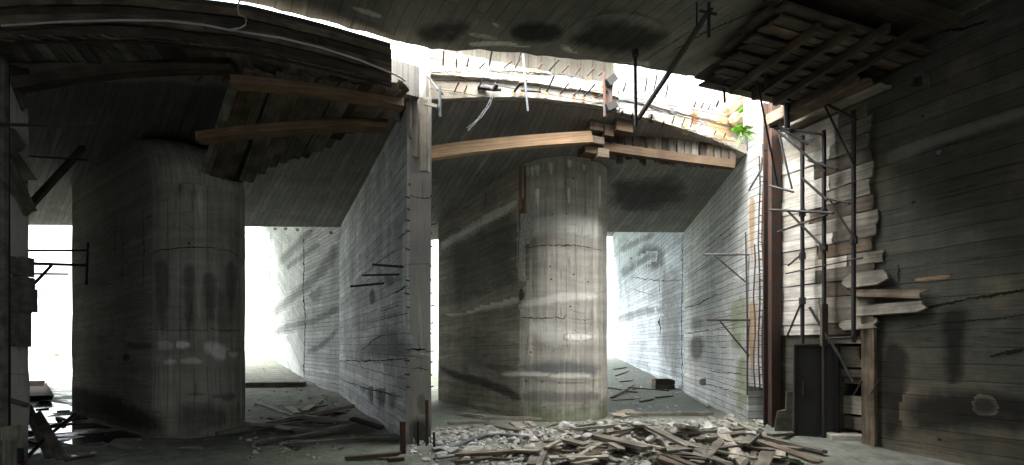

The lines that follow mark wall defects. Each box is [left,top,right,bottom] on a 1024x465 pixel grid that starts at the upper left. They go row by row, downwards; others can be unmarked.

rust [511,79,603,104]
water stain [124,257,240,366]
crack [341,231,517,398]
crack [528,219,742,381]
crack [902,289,1024,330]